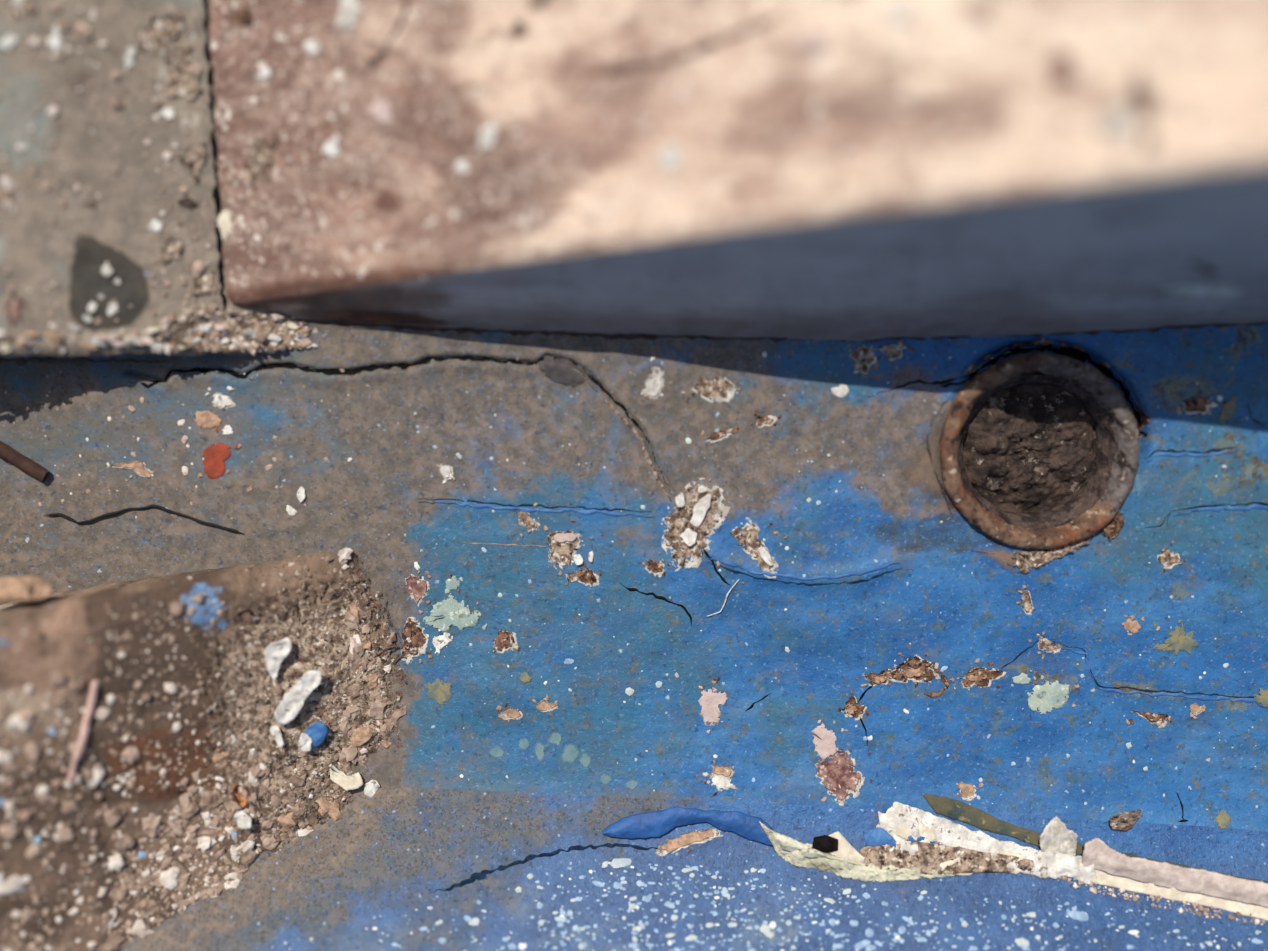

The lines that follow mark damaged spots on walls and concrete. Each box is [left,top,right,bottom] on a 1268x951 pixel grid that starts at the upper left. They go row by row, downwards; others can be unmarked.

crack [127,354,674,517]
peeling [642,478,788,578]
crack [703,548,730,585]
rust [980,550,1031,568]
crack [1145,502,1268,528]
crack [620,583,692,626]
spalling [196,554,431,840]
peeling [838,652,1007,721]
crack [1001,640,1268,709]
peeling [815,747,873,806]
peeling [655,825,728,856]
peeling [759,802,1268,921]